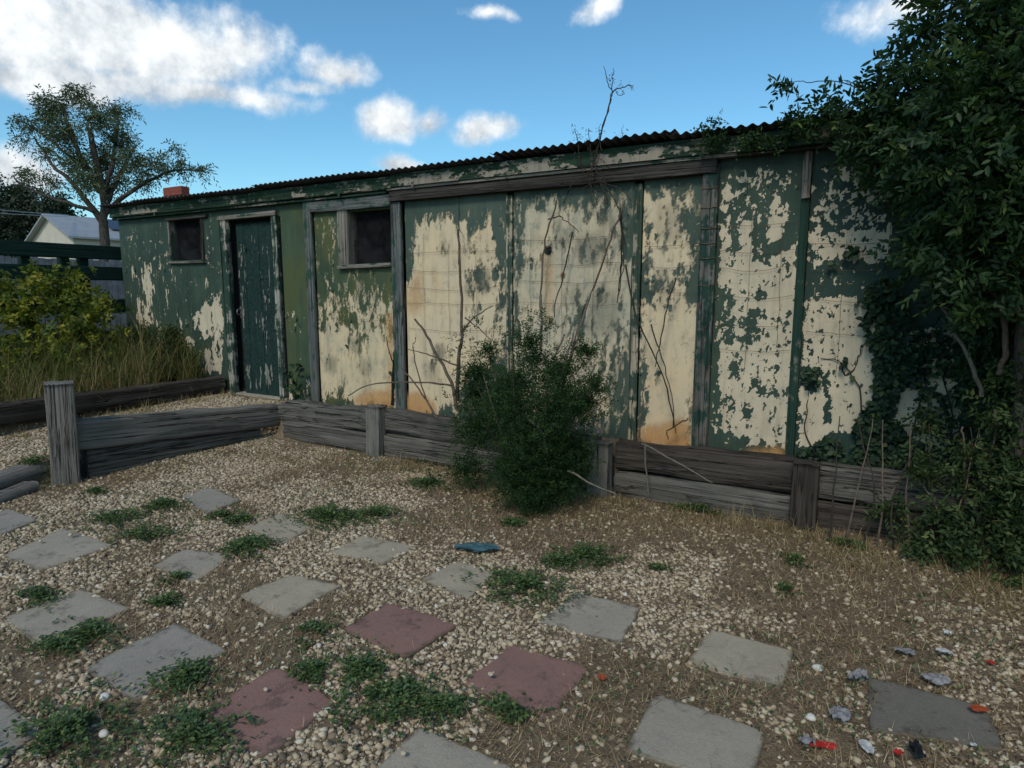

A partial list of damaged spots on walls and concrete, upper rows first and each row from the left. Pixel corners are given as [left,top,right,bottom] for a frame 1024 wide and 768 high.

peeling [382,154,577,190]
peeling [591,145,712,166]
peeling [124,205,225,375]
peeling [244,363,273,389]
peeling [239,235,301,349]
peeling [289,219,396,408]
peeling [406,184,701,446]
rust [642,421,687,446]
peeling [708,136,893,451]
peeling [890,327,964,453]